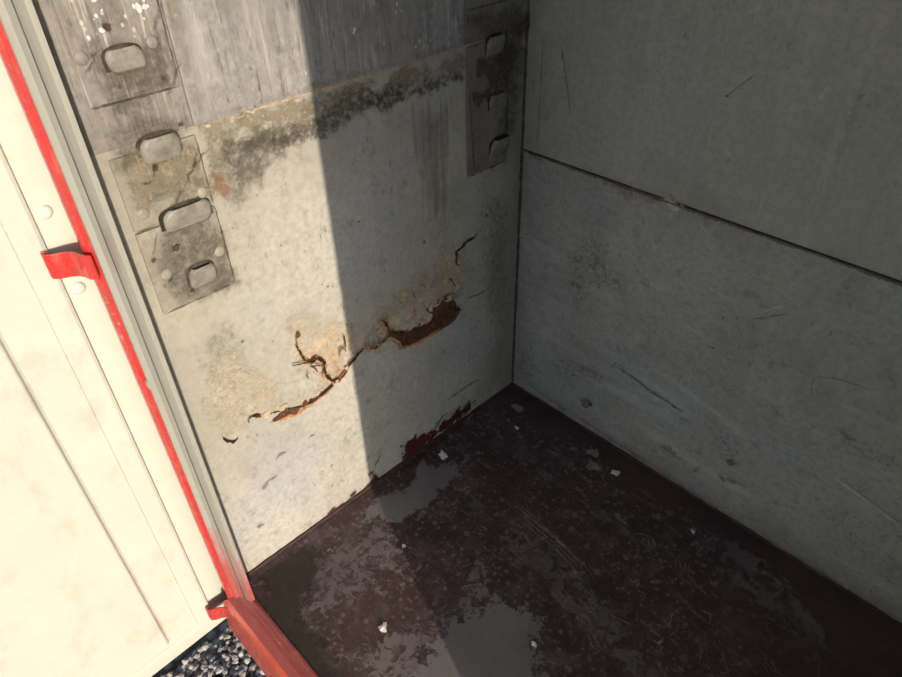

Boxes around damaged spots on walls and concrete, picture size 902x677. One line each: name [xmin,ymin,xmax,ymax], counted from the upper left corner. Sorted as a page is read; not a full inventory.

water stain [170,72,463,209]
spalling [387,294,461,350]
rust [300,324,356,392]
spalling [270,370,346,423]
water stain [259,549,337,677]